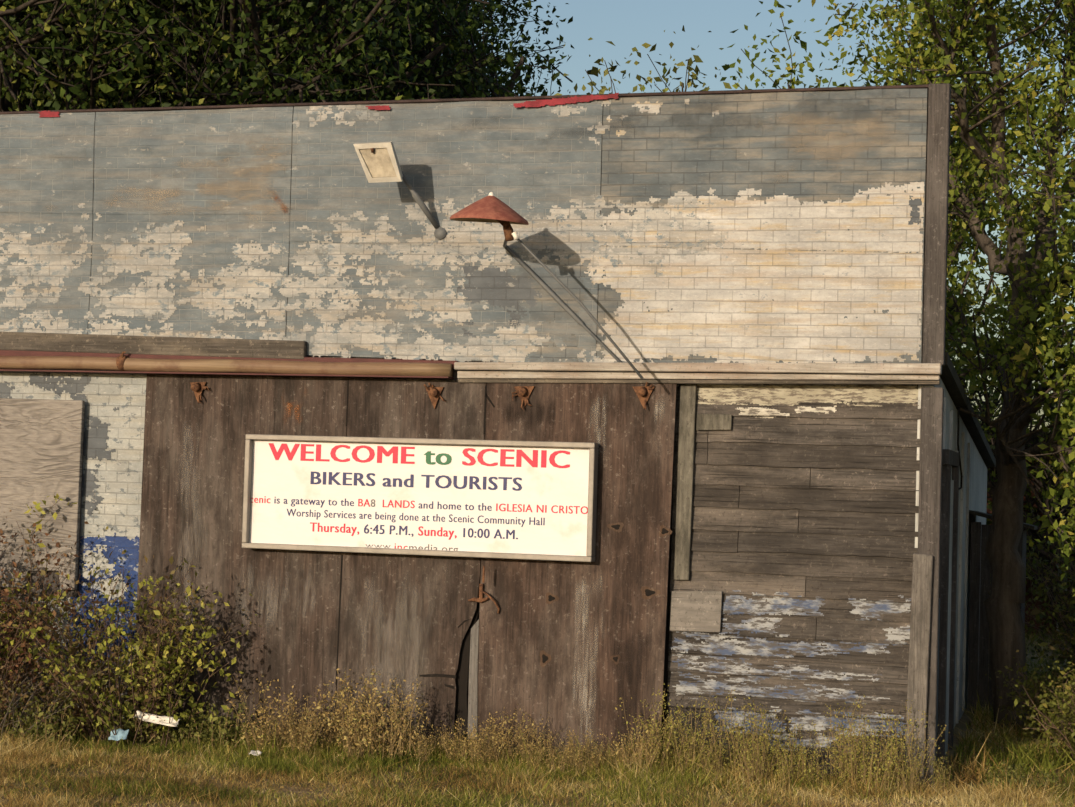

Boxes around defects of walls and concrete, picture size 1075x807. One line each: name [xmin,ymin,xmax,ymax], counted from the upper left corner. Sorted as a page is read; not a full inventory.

peeling [0,182,924,363]
peeling [0,381,15,398]
peeling [29,372,91,403]
peeling [81,416,116,516]
peeling [79,544,127,601]
crack [419,602,480,739]
peeling [663,590,911,753]